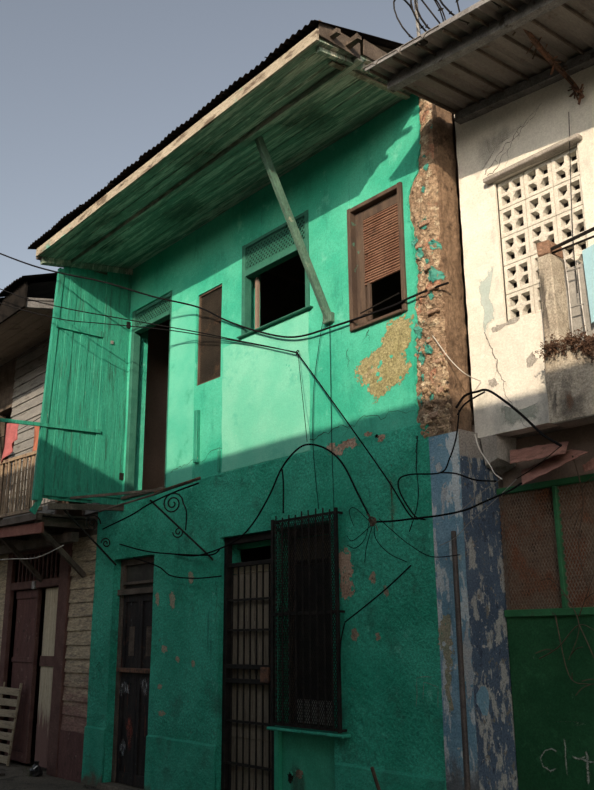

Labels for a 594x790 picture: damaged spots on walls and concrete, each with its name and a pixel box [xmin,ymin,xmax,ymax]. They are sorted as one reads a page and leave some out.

crack [485,103,542,176]
spalling [354,95,473,438]
peeling [326,431,385,456]
peeling [437,608,475,715]